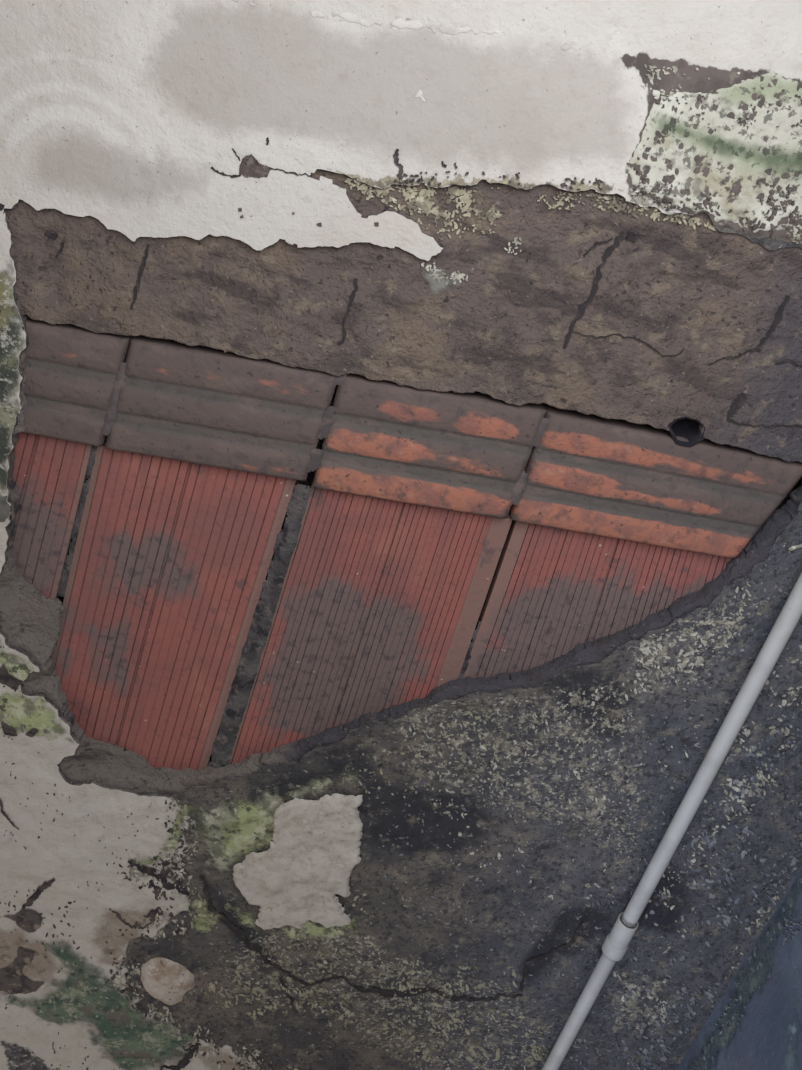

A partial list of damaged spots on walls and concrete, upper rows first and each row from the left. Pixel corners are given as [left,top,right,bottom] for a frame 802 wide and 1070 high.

crack [393,149,404,187]
crack [130,245,149,310]
crack [337,278,358,346]
water stain [421,262,468,292]
crack [563,232,684,356]
crack [708,295,802,367]
water stain [0,271,24,497]
spalling [0,53,802,798]
water stain [99,503,802,1070]
water stain [3,901,80,973]
crack [111,860,591,1013]